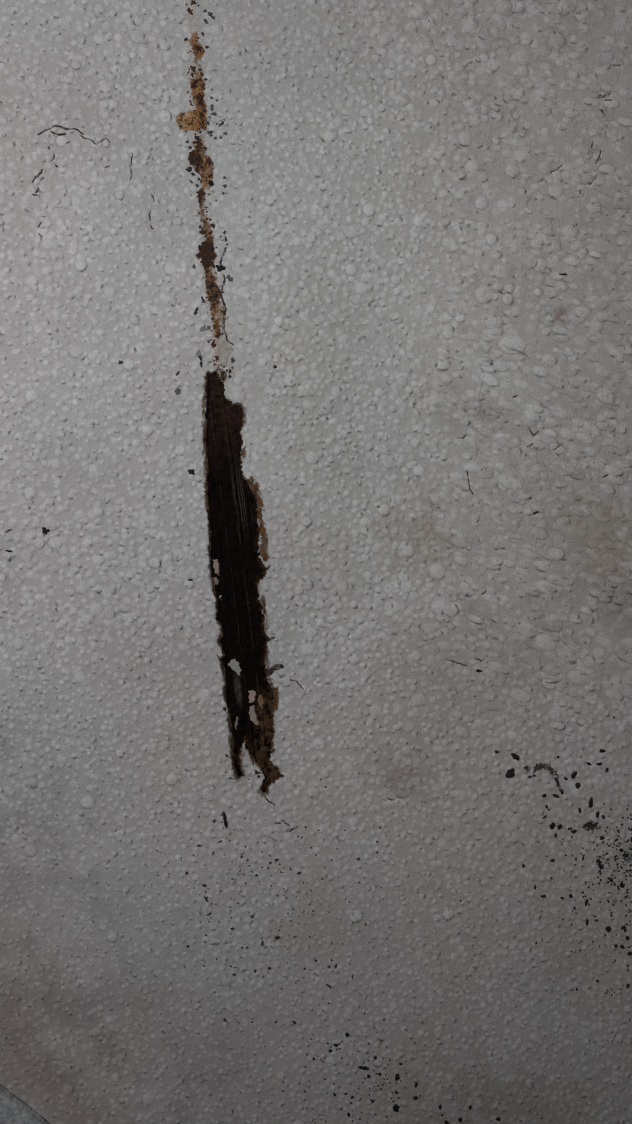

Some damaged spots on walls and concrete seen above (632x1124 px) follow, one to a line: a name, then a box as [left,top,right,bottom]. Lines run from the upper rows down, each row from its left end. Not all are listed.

rust [176,32,303,806]